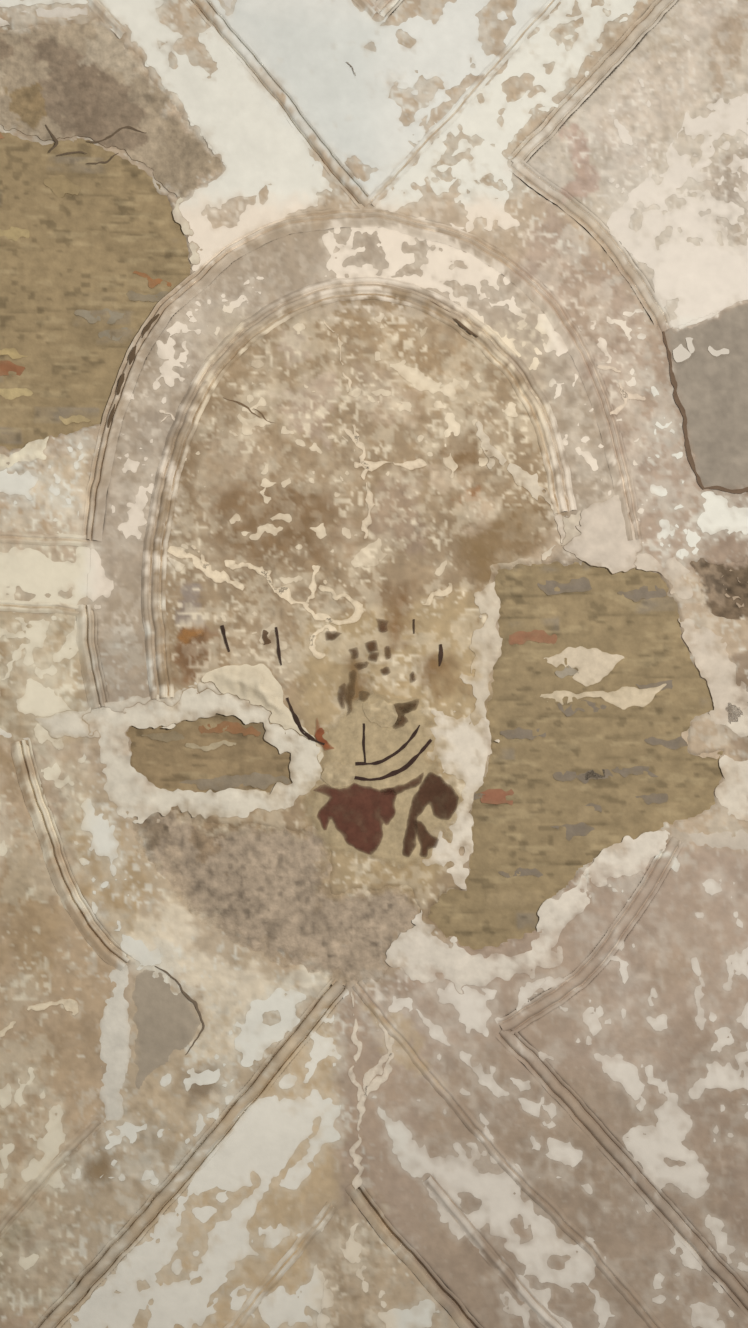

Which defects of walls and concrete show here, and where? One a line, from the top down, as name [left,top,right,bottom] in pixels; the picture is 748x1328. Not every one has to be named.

flaking render [0,0,646,515]
peeling [607,94,748,329]
peeling [111,439,154,546]
peeling [229,464,292,540]
flaking render [0,544,322,914]
flaking render [348,351,748,1037]
peeling [0,1067,81,1189]
peeling [70,1015,342,1328]
peeling [160,988,306,1144]
peeling [388,996,583,1178]
peeling [372,1096,615,1328]
peeling [559,957,748,1199]